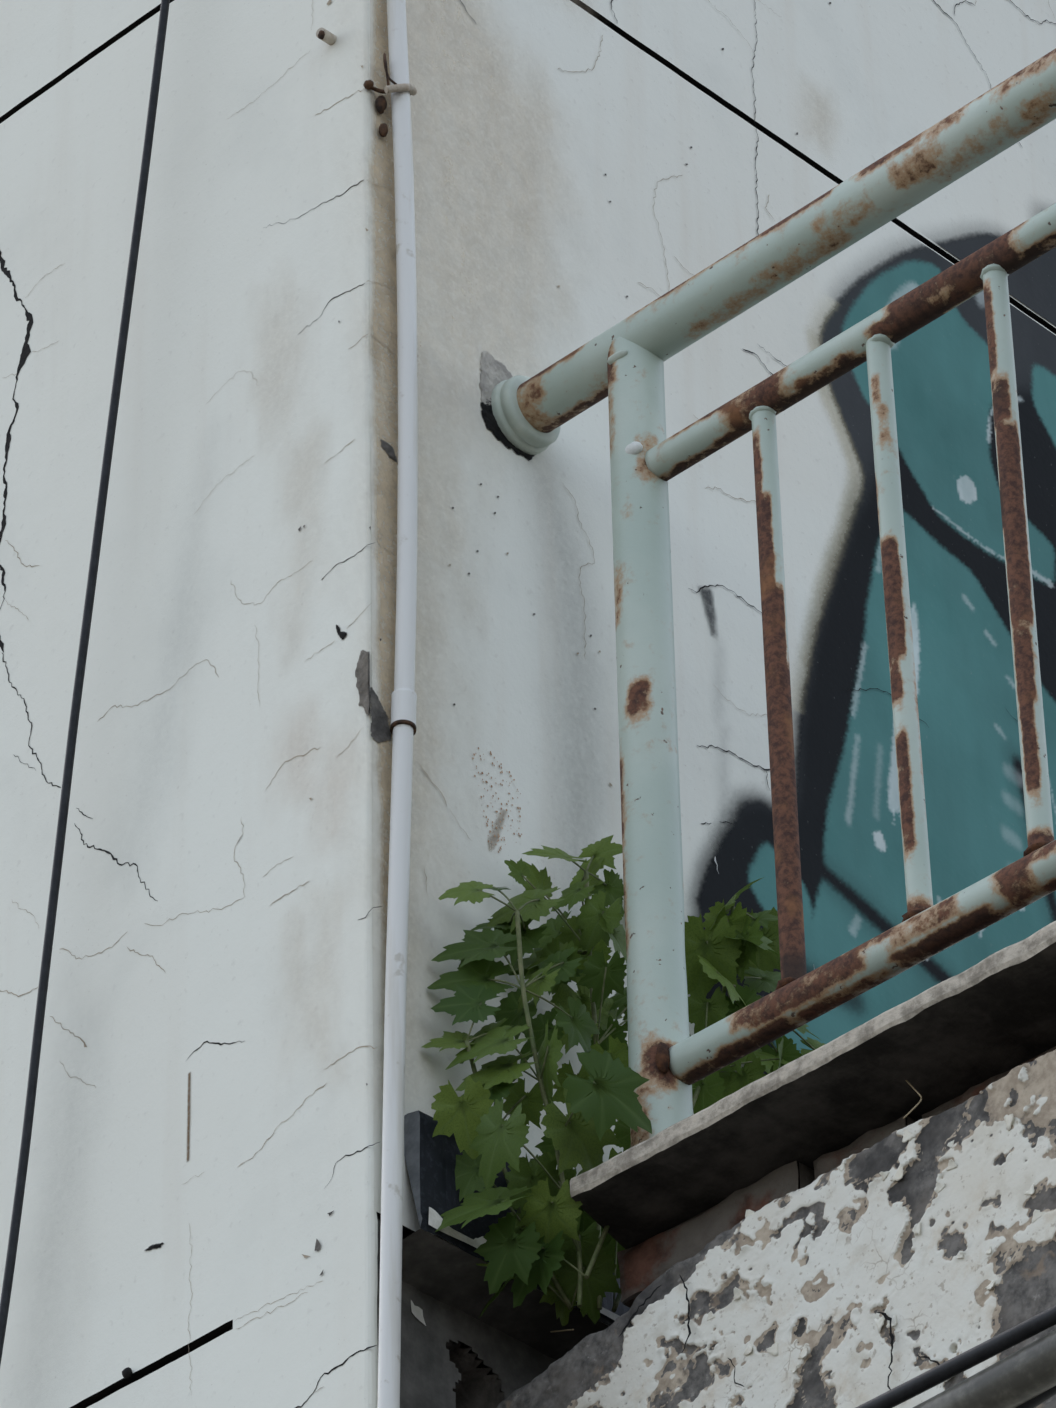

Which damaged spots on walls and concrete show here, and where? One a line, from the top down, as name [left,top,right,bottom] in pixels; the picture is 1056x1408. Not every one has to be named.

crack [708,0,780,235]
crack [0,251,309,972]
crack [231,543,392,706]
spalling [355,638,391,743]
crack [0,986,96,1088]
crack [188,1041,244,1058]
spalling [428,1207,487,1248]
flaking render [819,1049,1056,1365]
crack [295,1345,377,1408]
peeling [446,1209,755,1408]
spalling [744,1319,778,1358]
spalling [784,1313,844,1408]